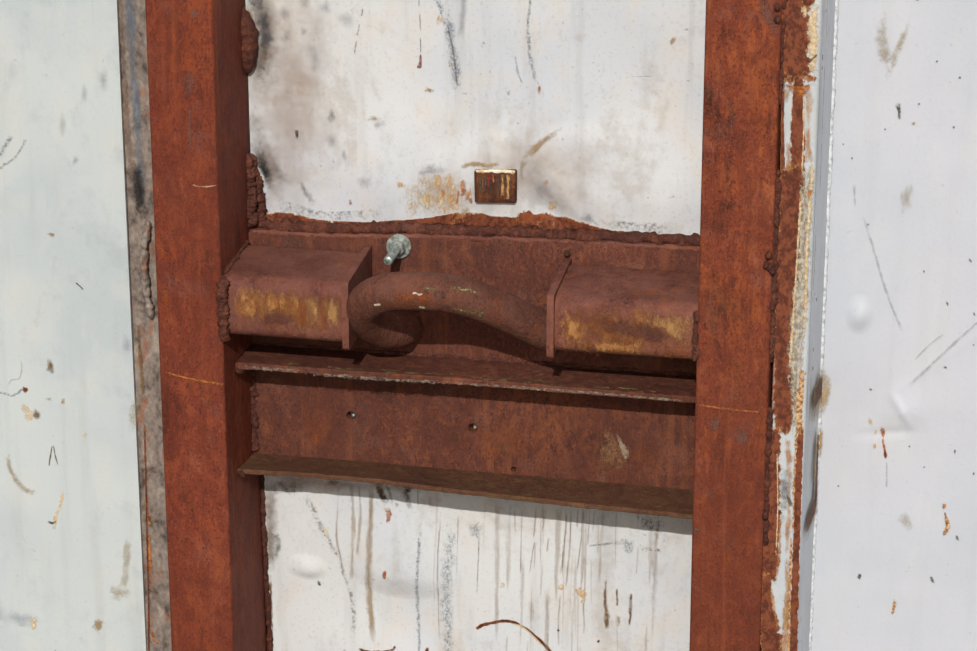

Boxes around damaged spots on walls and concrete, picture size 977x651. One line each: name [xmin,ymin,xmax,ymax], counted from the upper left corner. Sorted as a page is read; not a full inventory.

corrosion [121,78,134,171]
corrosion [265,174,630,233]
peeling [760,0,819,651]
corrosion [809,368,829,419]
corrosion [143,424,158,651]
corrosion [771,427,823,651]